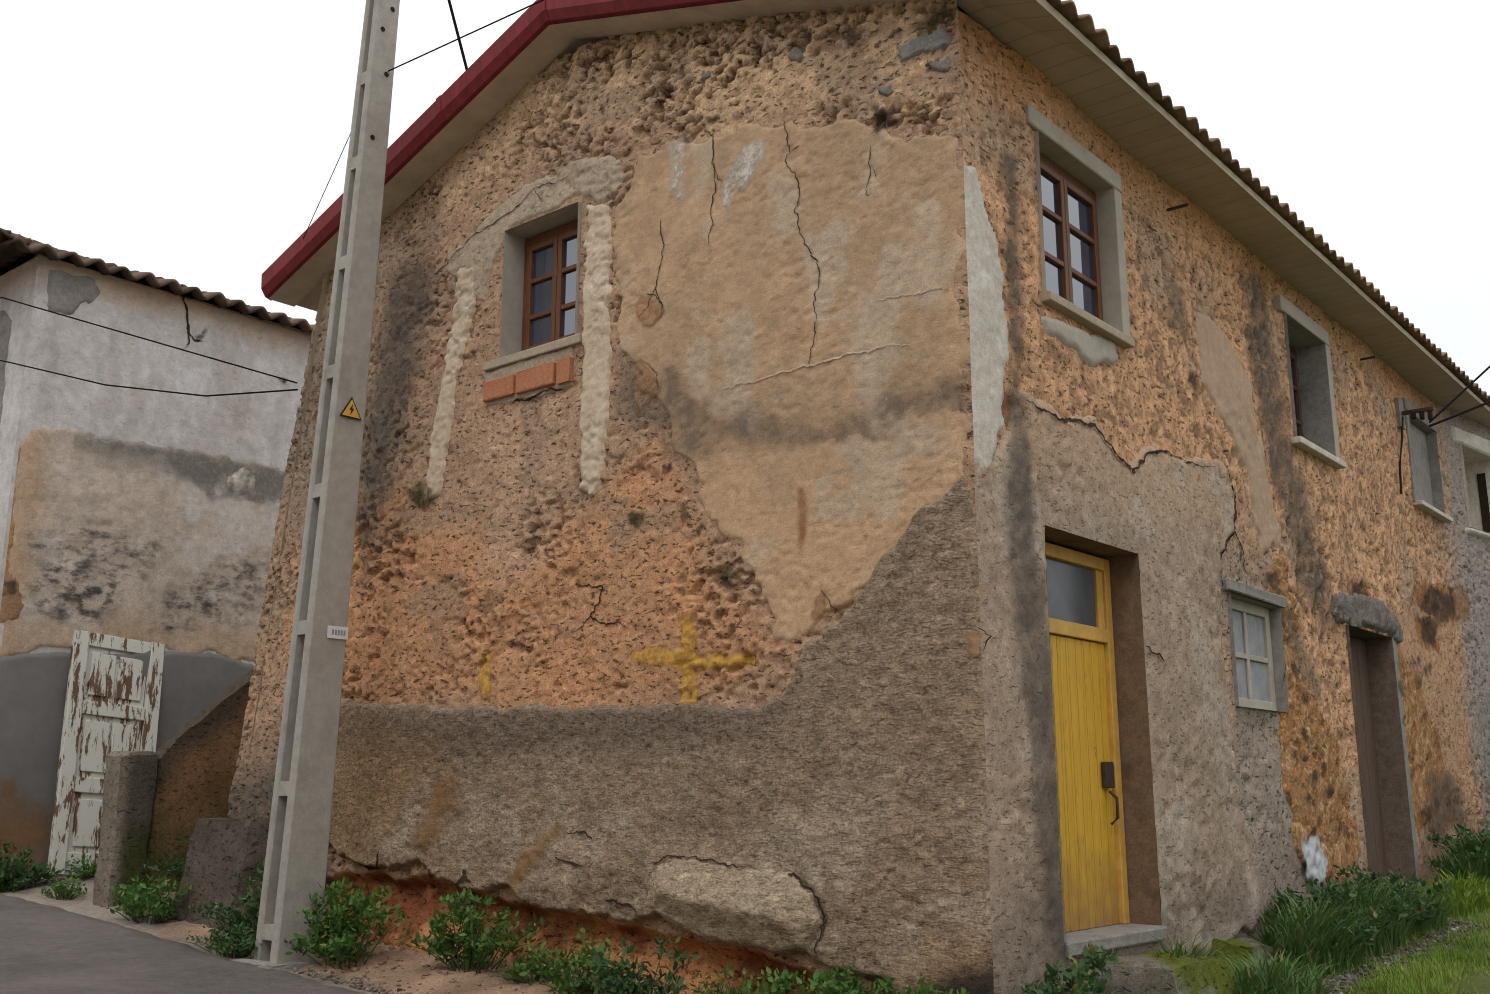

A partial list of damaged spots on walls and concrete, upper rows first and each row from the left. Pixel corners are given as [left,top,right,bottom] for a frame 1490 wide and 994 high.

spalling [846,3,954,73]
crack [698,114,722,245]
crack [784,126,820,370]
crack [182,284,205,347]
peeling [425,267,477,500]
water stain [39,530,153,619]
water stain [166,563,257,614]
water stain [168,450,285,501]
peeling [579,84,1361,994]
crack [1027,399,1248,592]
spalling [1397,584,1469,837]
crack [649,854,827,957]